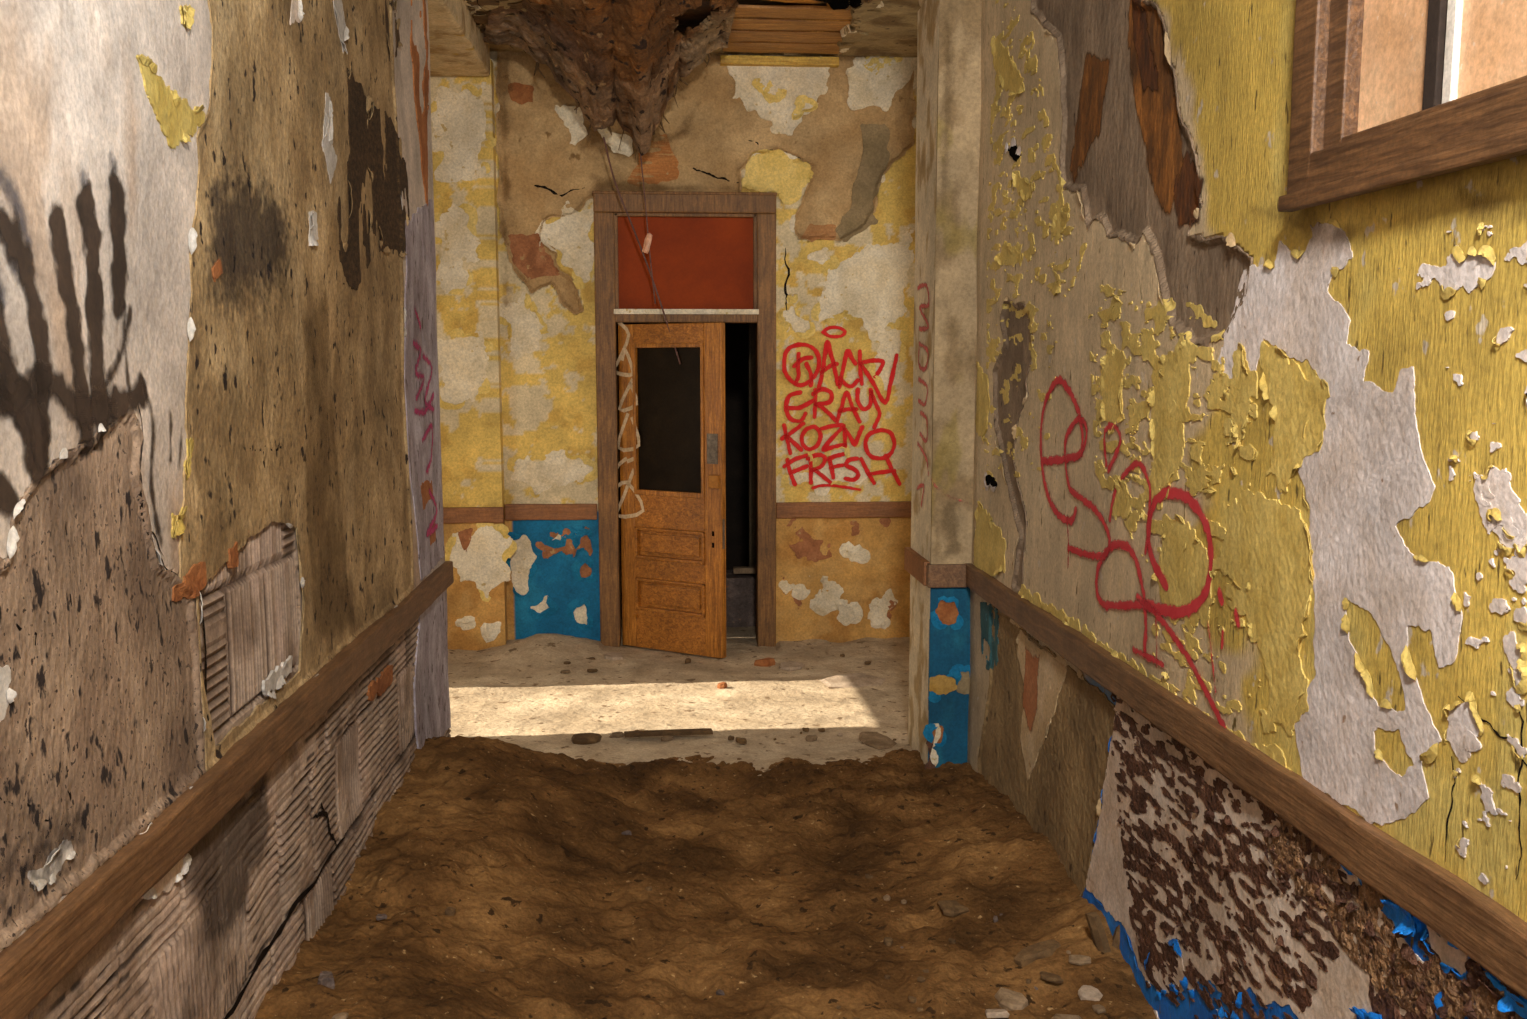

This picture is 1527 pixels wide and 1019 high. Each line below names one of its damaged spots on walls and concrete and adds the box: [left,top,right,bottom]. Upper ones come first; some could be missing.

peeling [976,0,1527,858]
crack [224,802,345,1019]